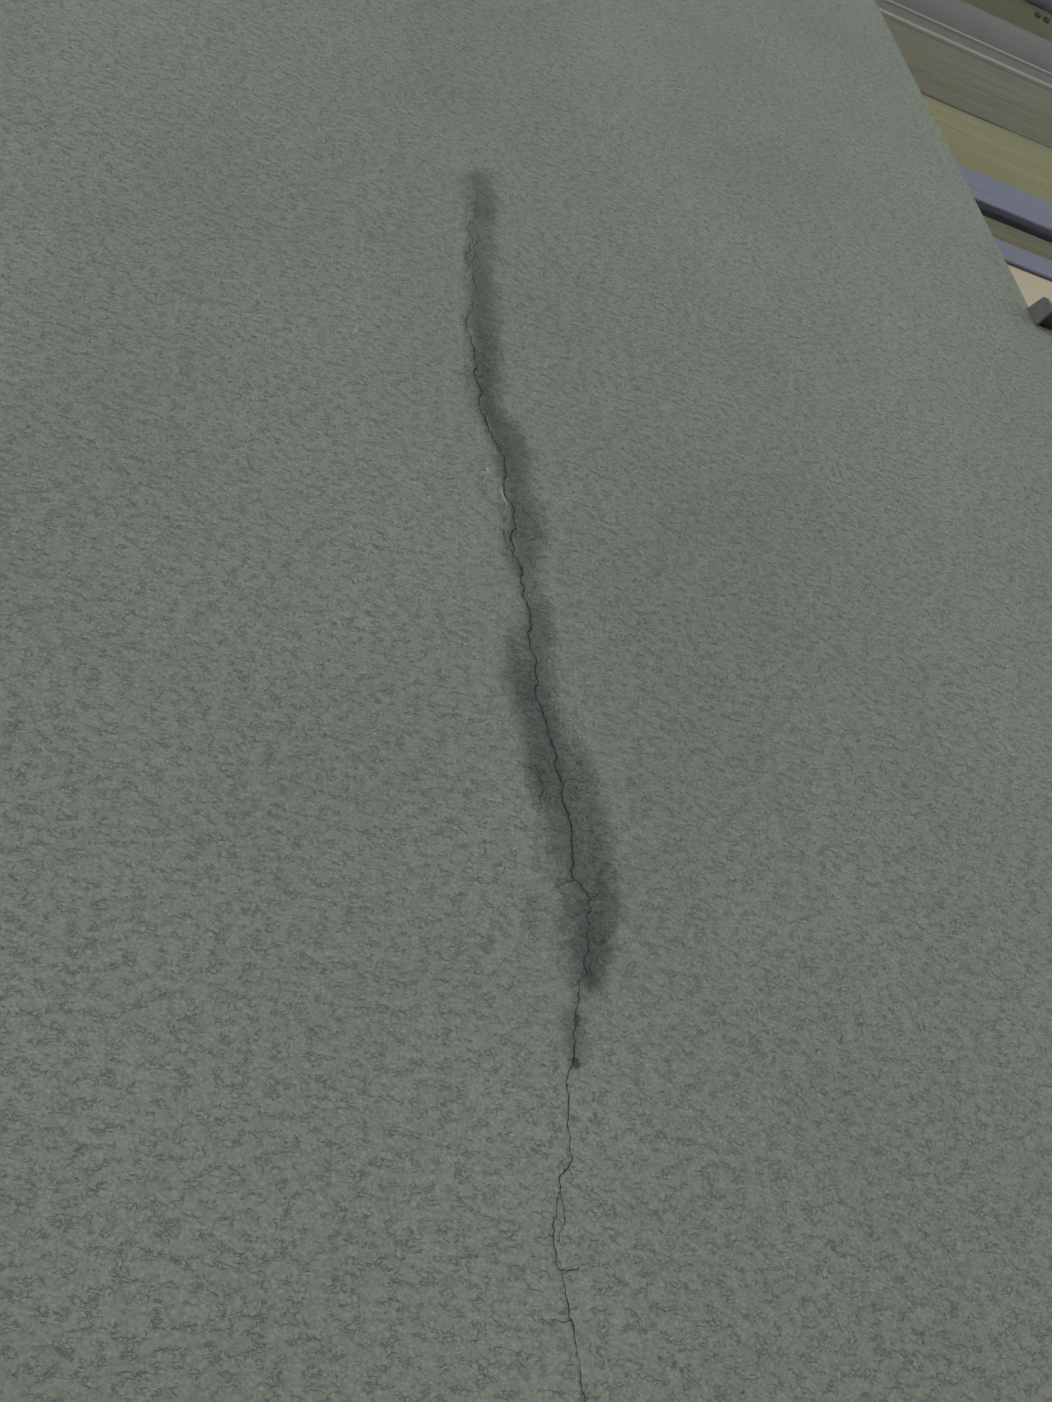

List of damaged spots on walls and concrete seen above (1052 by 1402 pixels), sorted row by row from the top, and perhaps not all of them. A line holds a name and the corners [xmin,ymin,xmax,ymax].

crack [465,175,602,1402]